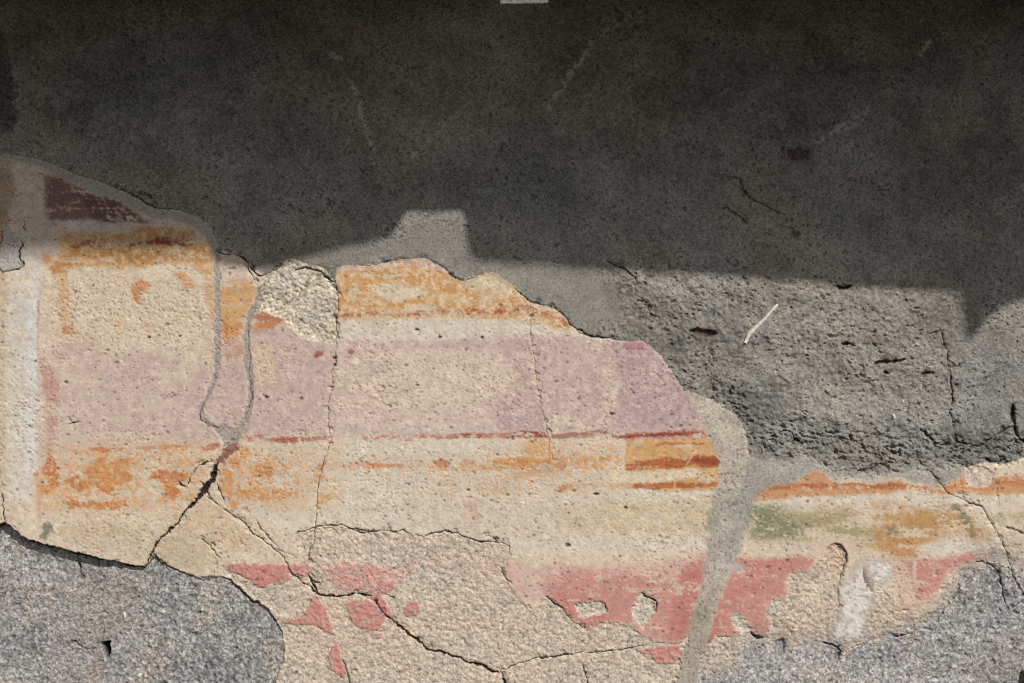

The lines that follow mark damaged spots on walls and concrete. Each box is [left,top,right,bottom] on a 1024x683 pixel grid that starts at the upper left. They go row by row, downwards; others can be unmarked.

crack [718,177,795,234]
flaking render [260,260,340,344]
crack [607,261,676,327]
crack [0,250,642,683]
flaking render [708,376,1024,489]
crack [873,331,1024,610]
flaking render [699,550,848,676]
flaking render [861,563,981,645]